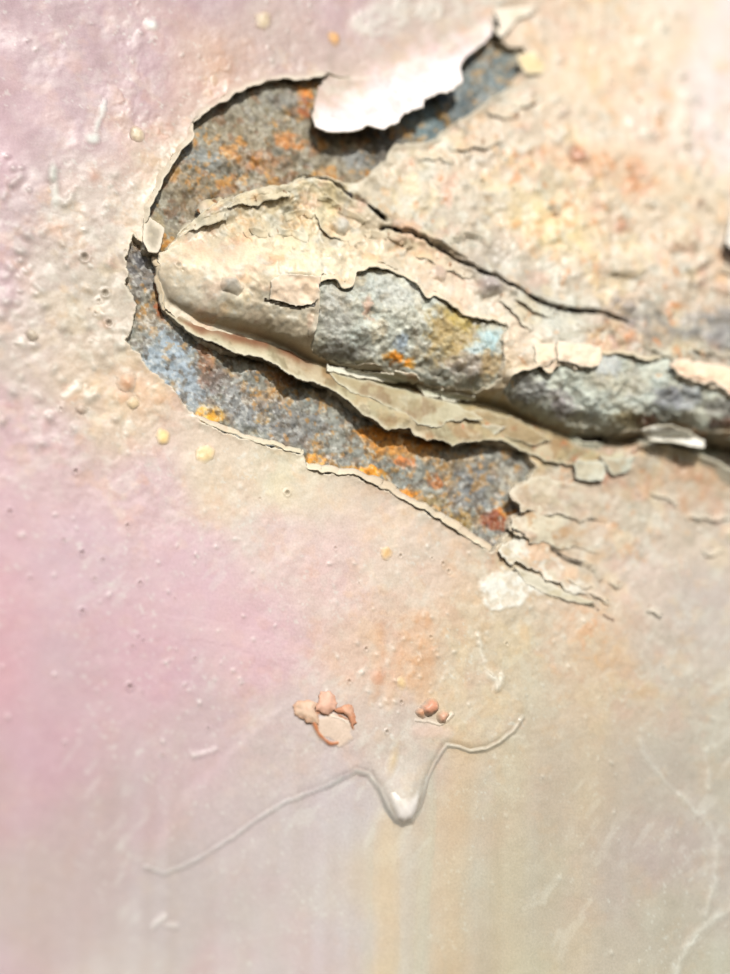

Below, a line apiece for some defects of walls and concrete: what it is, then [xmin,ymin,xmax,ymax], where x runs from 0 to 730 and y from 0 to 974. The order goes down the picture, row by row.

peeling [126,0,730,613]
crack [304,177,626,323]
rust [78,350,174,428]